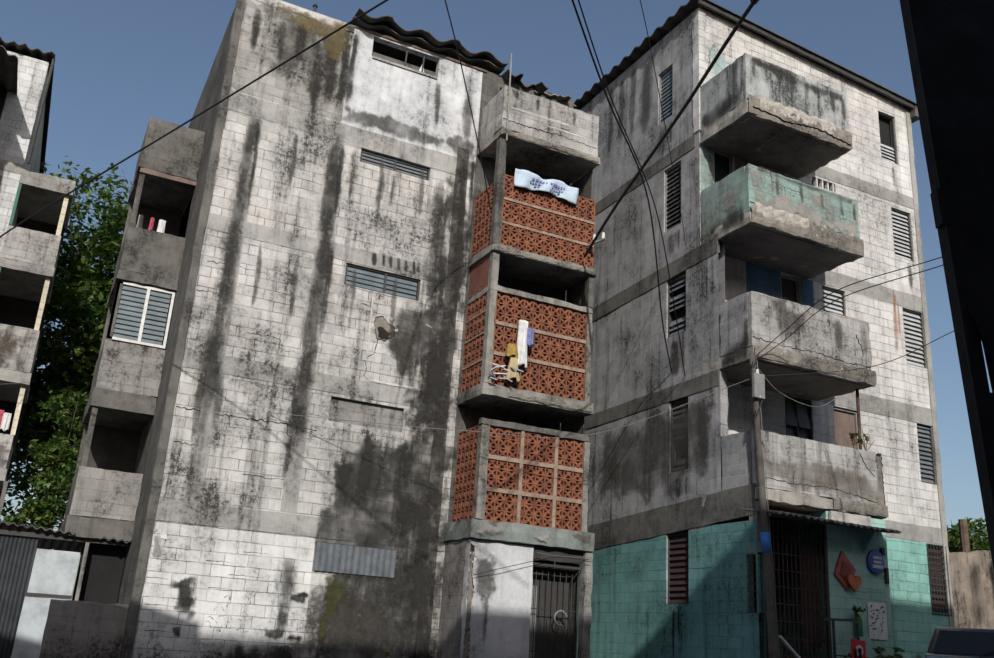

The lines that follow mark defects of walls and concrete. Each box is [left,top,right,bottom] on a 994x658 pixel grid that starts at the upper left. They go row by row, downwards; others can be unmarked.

water stain [252,14,261,47]
water stain [277,25,358,102]
mould [752,58,793,84]
mould [806,83,846,118]
spalling [748,94,853,149]
spalling [750,168,864,256]
water stain [196,122,259,411]
spalling [371,315,398,342]
crack [753,333,870,368]
water stain [266,135,480,658]
crack [768,470,877,503]
water stain [171,577,195,618]